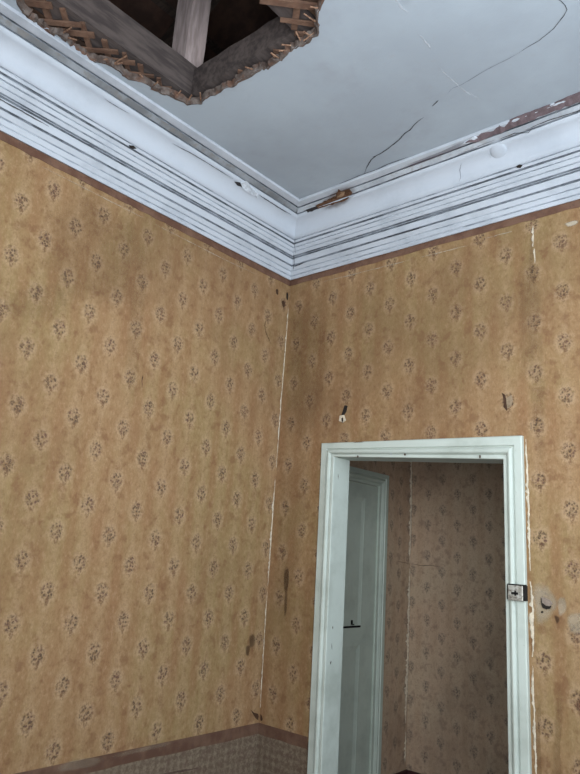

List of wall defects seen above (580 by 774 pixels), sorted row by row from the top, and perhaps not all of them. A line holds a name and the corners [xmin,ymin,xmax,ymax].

flaking render [36,20,67,42]
crack [342,0,580,197]
peeling [462,92,580,145]
spalling [306,189,352,212]